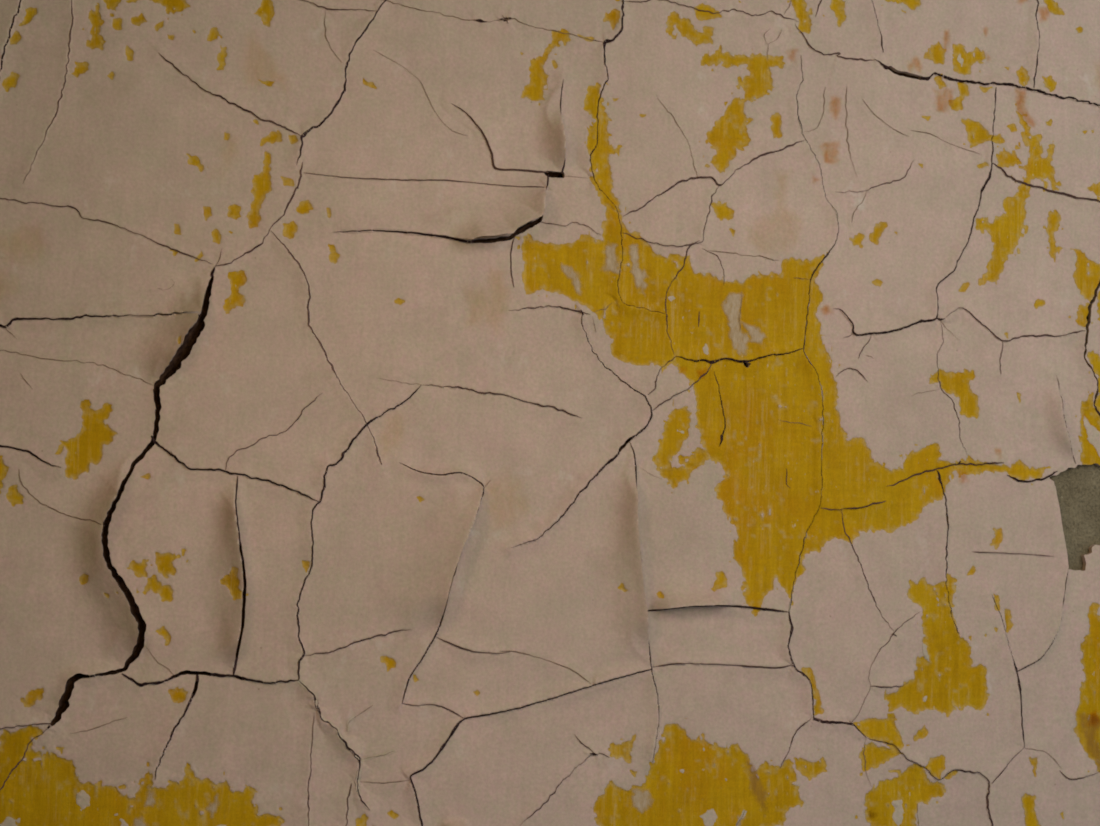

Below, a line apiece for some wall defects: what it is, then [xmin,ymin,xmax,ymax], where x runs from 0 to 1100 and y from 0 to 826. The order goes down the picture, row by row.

peeling [82,0,190,50]
crack [0,0,446,826]
crack [337,103,565,190]
crack [343,216,601,286]
crack [453,0,1012,826]
peeling [411,0,1100,661]
crack [667,0,1100,632]
peeling [0,724,285,826]
crack [370,616,702,826]
peeling [593,718,827,826]
peeling [853,566,990,826]
peeling [1074,602,1100,773]